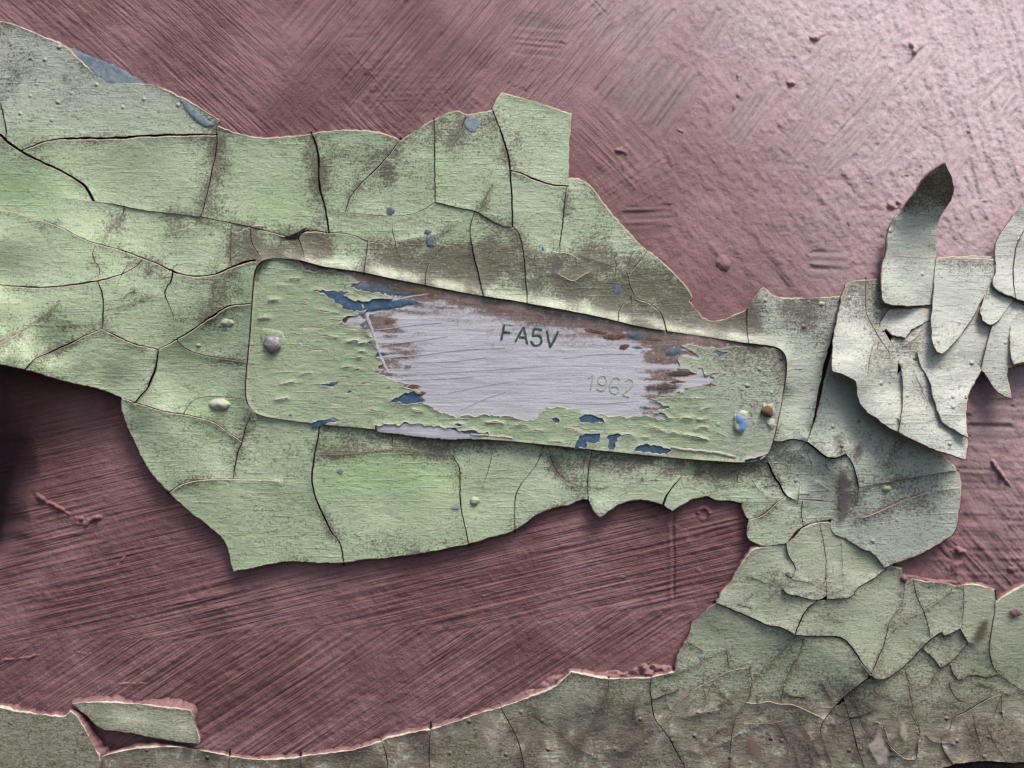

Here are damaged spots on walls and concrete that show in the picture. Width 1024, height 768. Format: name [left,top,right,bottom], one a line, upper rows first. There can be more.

crack [0,103,593,477]
peeling [0,21,1024,572]
crack [311,426,345,566]
crack [451,455,471,547]
peeling [0,520,1024,768]
crack [514,446,592,533]
crack [634,323,1024,768]